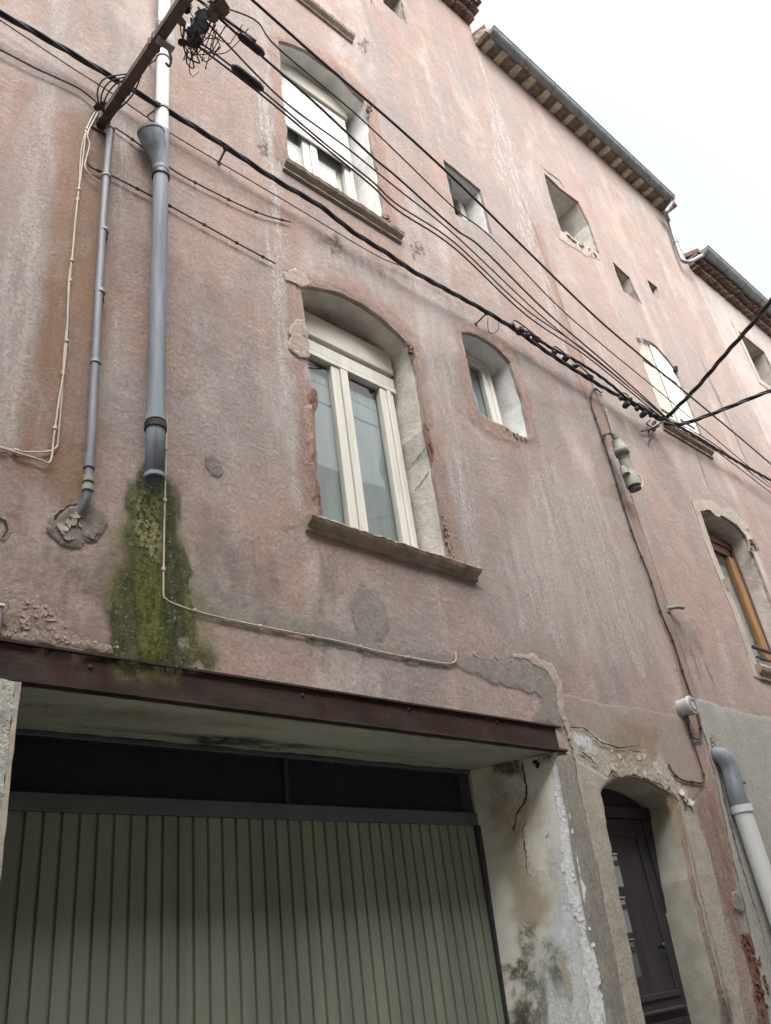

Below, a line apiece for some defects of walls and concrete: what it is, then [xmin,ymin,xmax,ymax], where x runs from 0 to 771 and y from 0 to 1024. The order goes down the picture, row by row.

flaking render [0,590,119,654]
flaking render [46,500,108,547]
water stain [117,490,199,659]
crack [512,763,531,877]
peeling [533,753,606,1024]
peeling [566,725,770,1024]
water stain [501,898,593,1024]